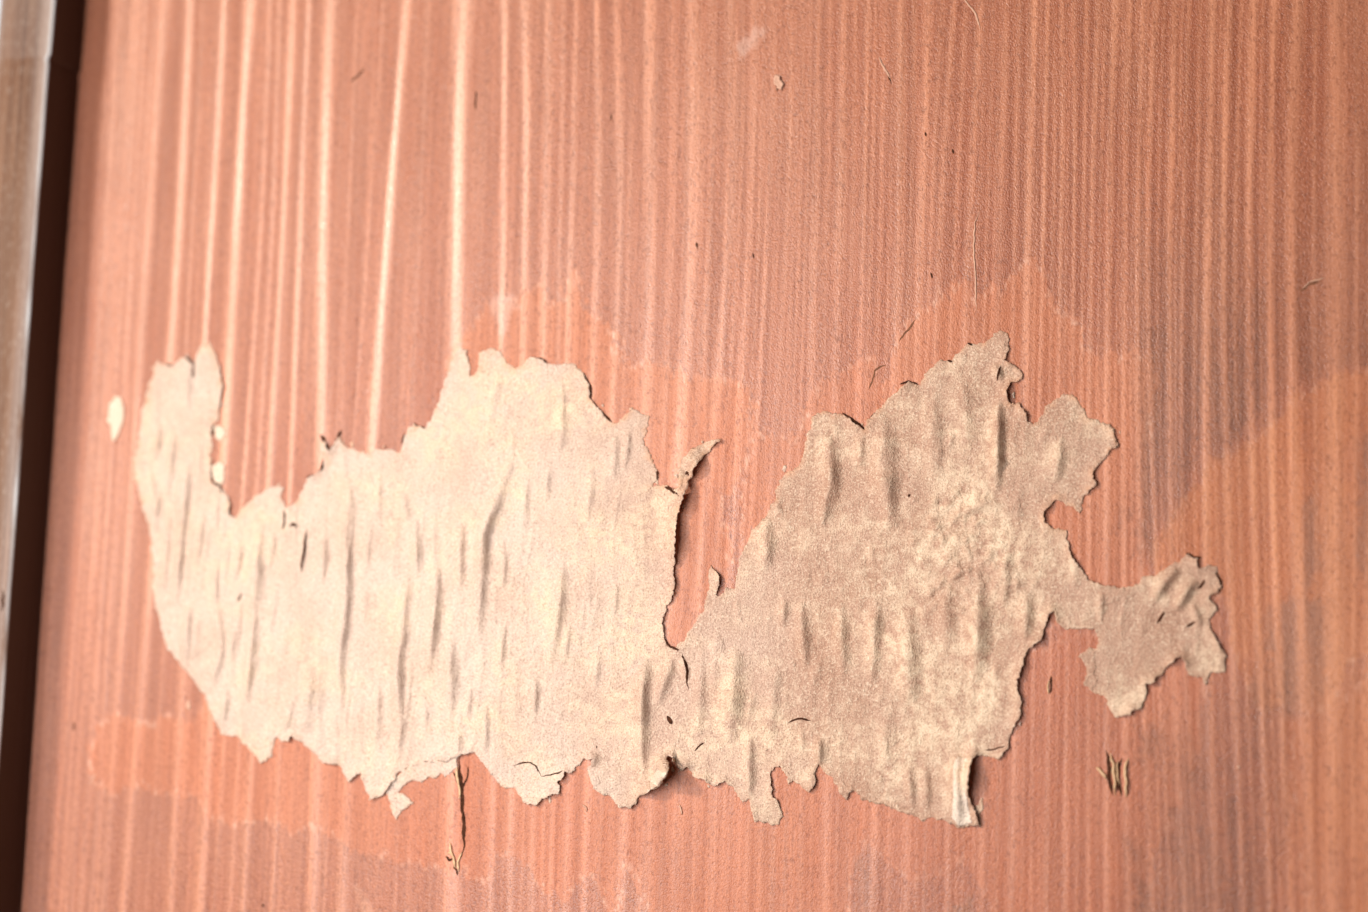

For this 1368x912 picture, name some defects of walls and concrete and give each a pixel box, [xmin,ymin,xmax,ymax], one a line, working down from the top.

peeling [107,396,124,442]
peeling [214,425,226,441]
peeling [211,461,225,485]